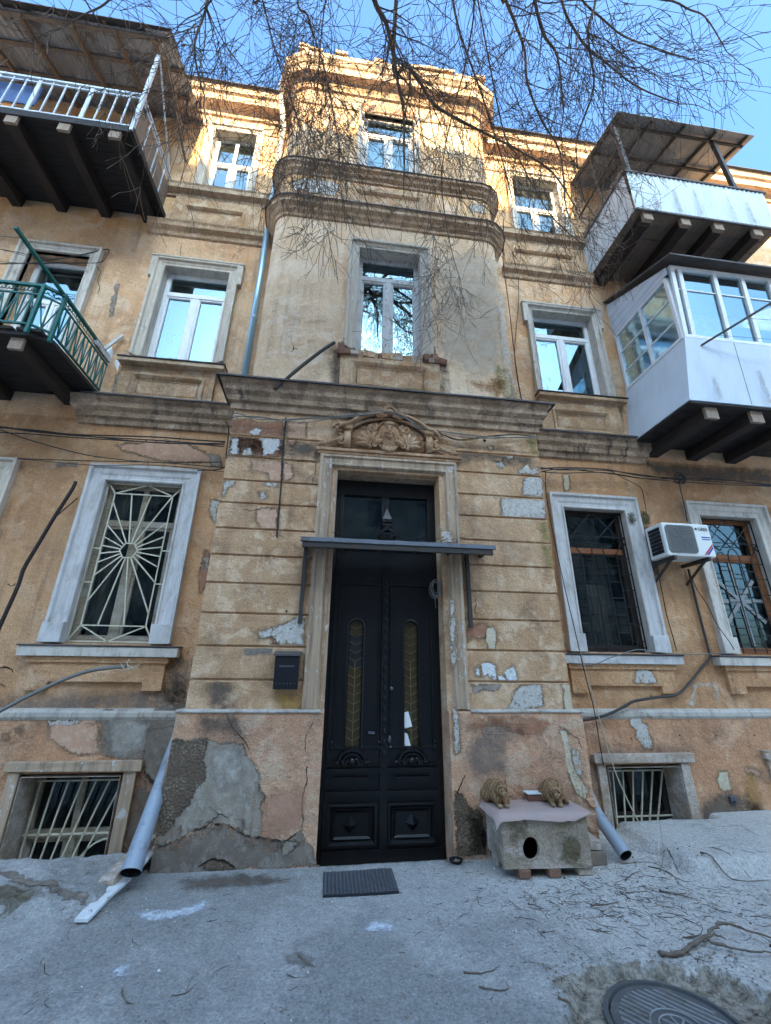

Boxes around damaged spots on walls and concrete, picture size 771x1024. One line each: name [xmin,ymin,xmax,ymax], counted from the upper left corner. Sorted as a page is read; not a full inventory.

peeling [116,418,307,529]
peeling [488,446,547,518]
peeling [257,616,306,645]
peeling [632,664,657,685]
peeling [508,684,544,709]
peeling [629,719,654,751]
spalling [47,703,266,848]
crack [194,721,314,849]
spalling [453,793,487,857]
crack [198,858,235,868]
spalling [204,858,236,871]